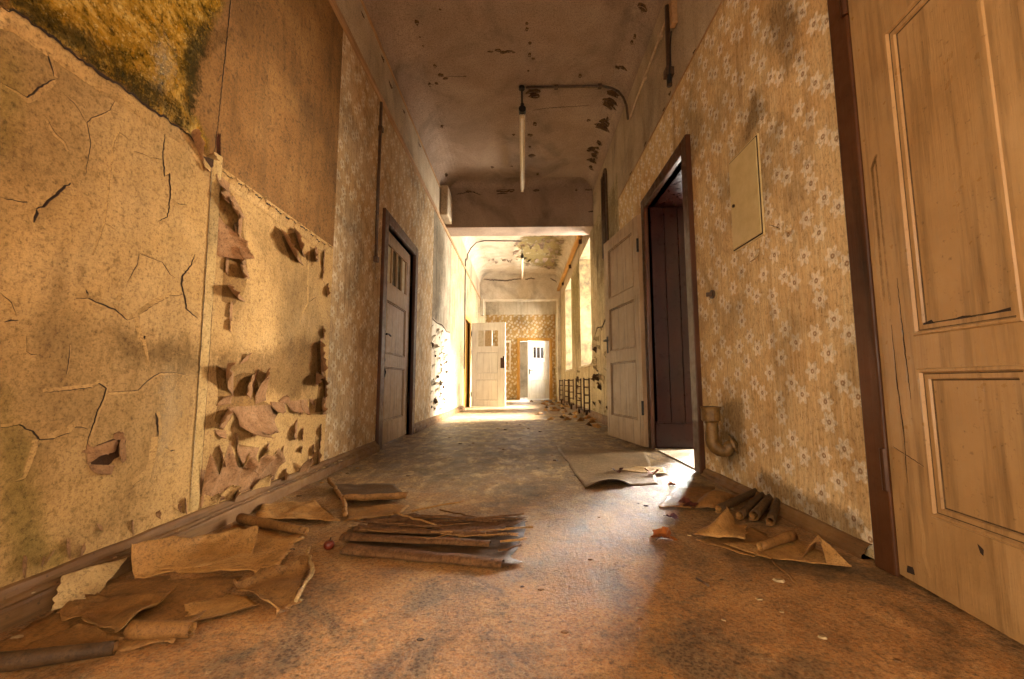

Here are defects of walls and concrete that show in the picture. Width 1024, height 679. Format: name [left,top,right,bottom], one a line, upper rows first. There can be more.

crack [0,49,187,255]
water stain [10,0,223,152]
peeling [586,90,620,170]
peeling [489,238,564,270]
crack [0,251,200,485]
peeling [82,431,127,475]
peeling [178,325,329,515]
peeling [430,328,449,411]